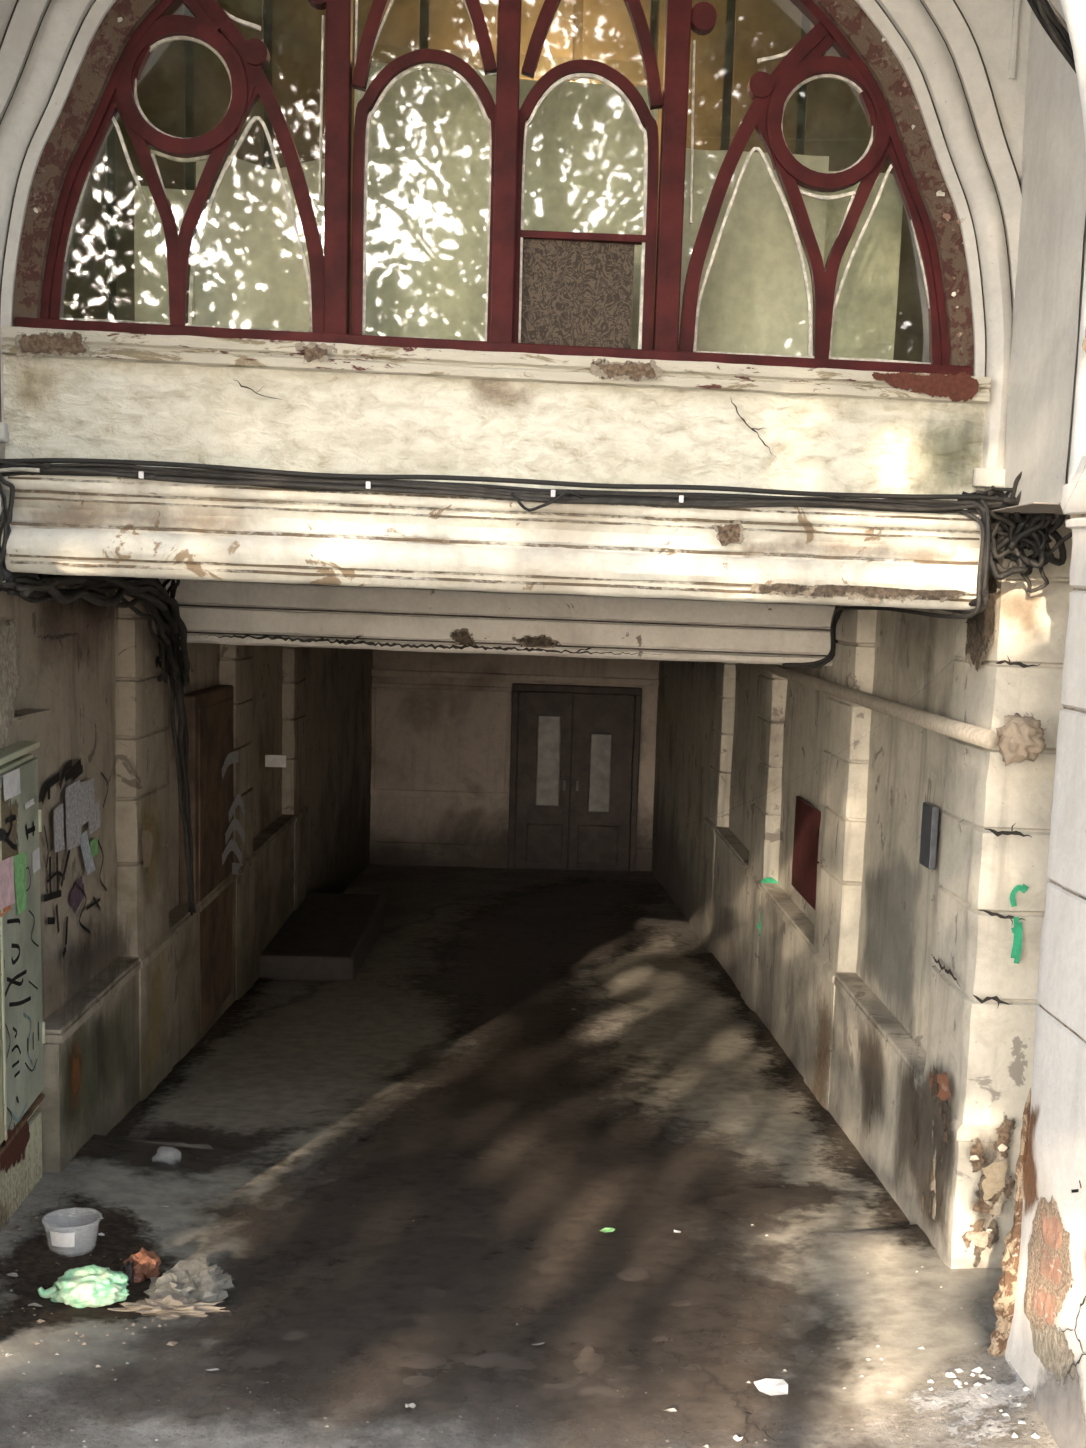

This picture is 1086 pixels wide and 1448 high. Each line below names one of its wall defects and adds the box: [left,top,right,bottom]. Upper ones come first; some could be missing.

peeling [872,371,979,402]
crack [979,910,1026,924]
crack [931,954,1011,1009]
damp [858,1035,914,1183]
spalling [911,1065,1079,1384]